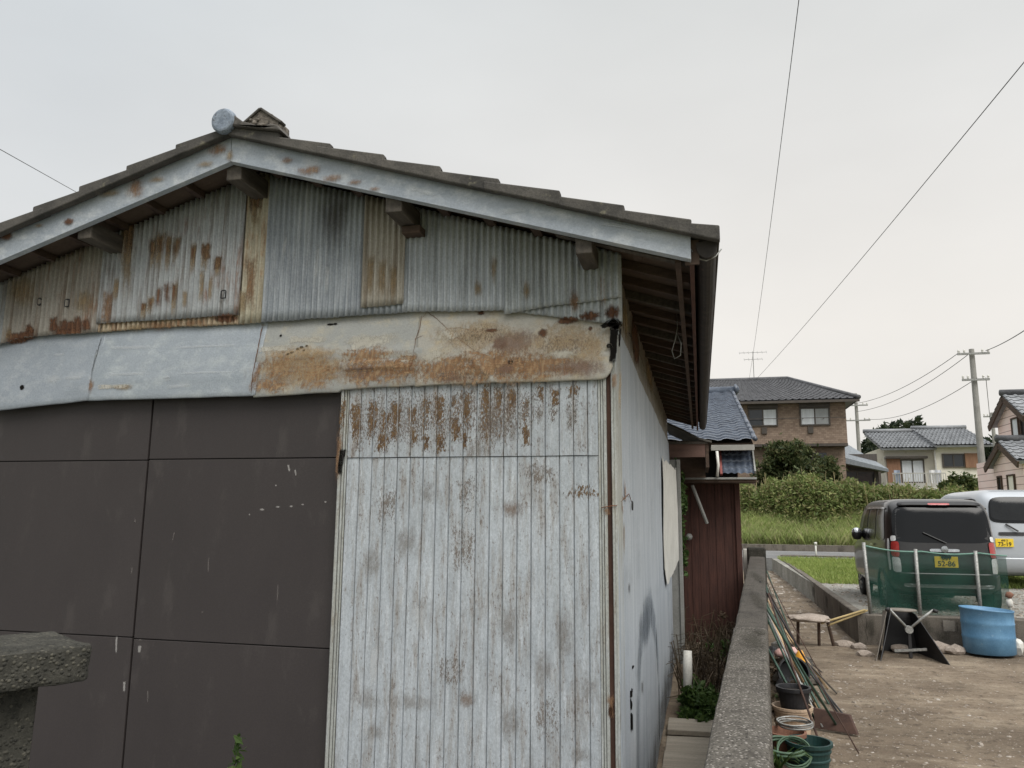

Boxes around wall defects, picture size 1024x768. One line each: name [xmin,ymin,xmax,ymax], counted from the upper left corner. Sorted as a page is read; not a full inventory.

corrosion [6,325,34,344]
corrosion [49,317,90,334]
corrosion [133,236,222,330]
corrosion [367,259,396,293]
corrosion [558,277,652,385]
corrosion [253,329,597,474]